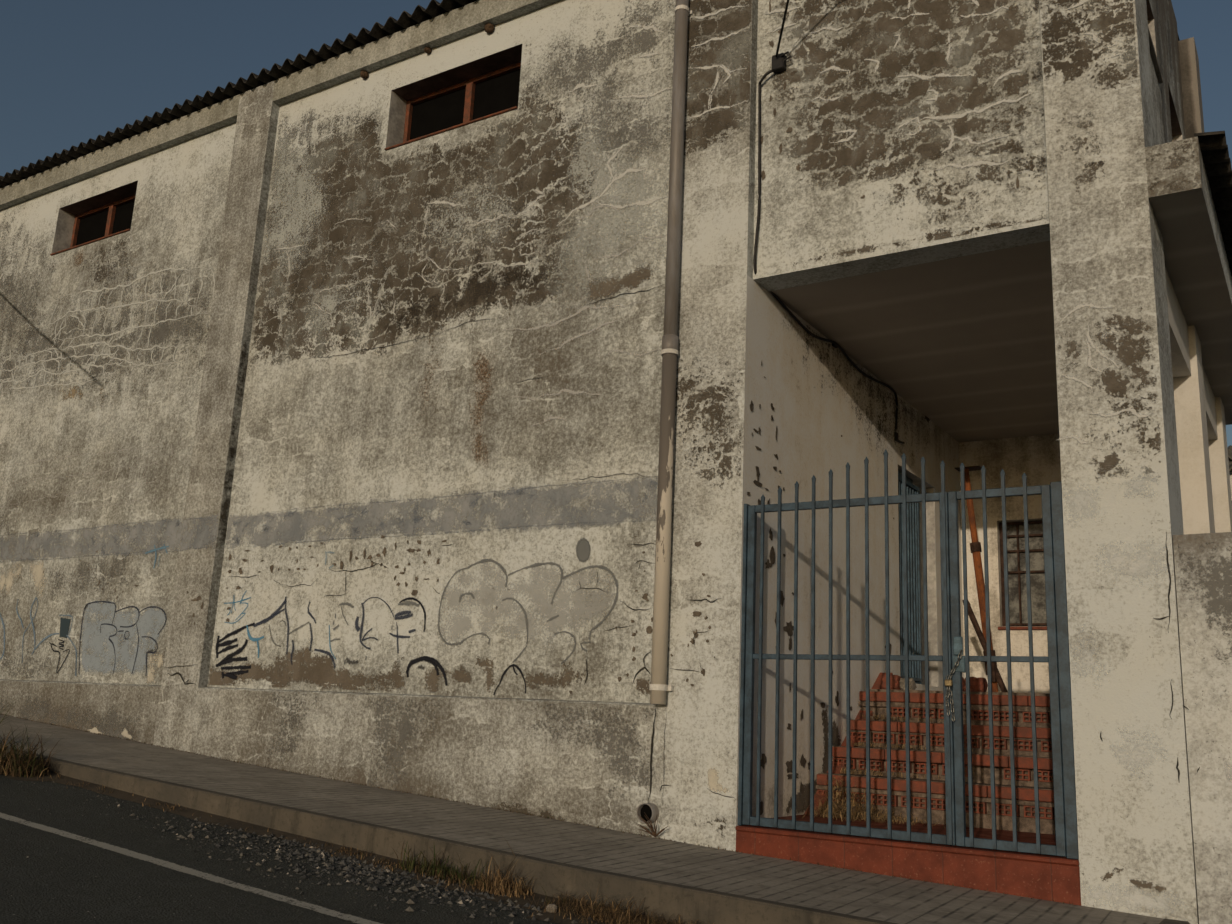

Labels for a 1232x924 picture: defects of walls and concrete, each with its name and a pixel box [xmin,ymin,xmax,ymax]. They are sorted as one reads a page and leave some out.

water stain [1146,0,1196,192]
water stain [237,0,1138,401]
water stain [219,421,236,541]
water stain [675,357,743,491]
water stain [783,315,930,464]
water stain [1058,307,1161,479]
water stain [1179,542,1232,662]